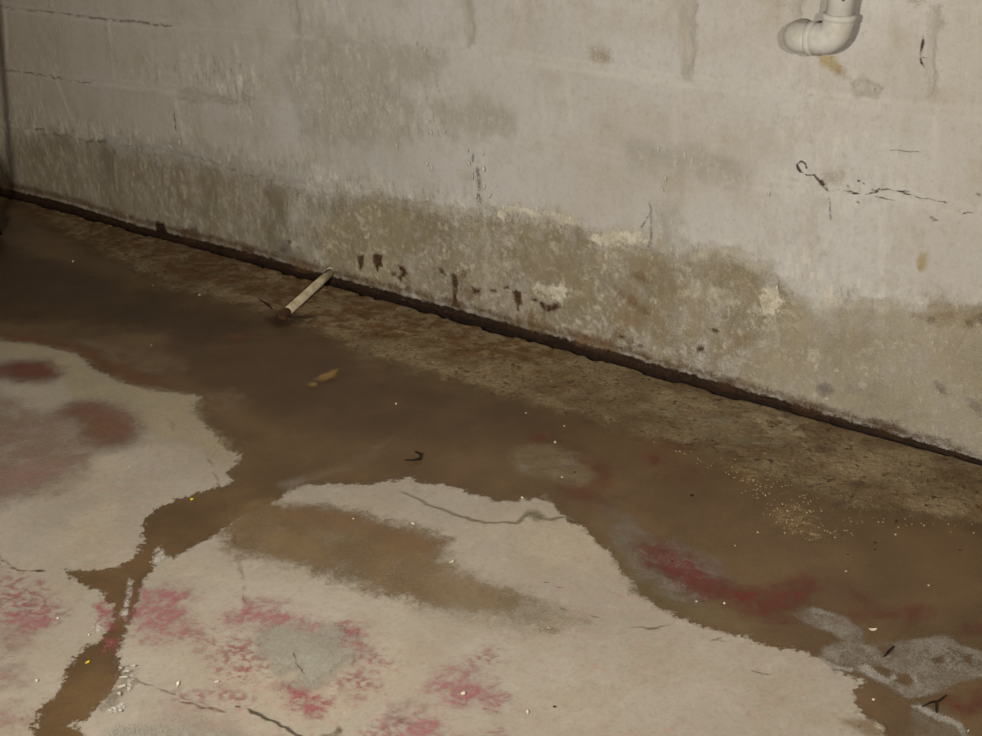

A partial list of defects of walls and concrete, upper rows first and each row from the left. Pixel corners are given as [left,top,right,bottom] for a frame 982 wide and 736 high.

crack [796,160,979,221]
crack [399,491,575,524]
crack [115,665,340,736]